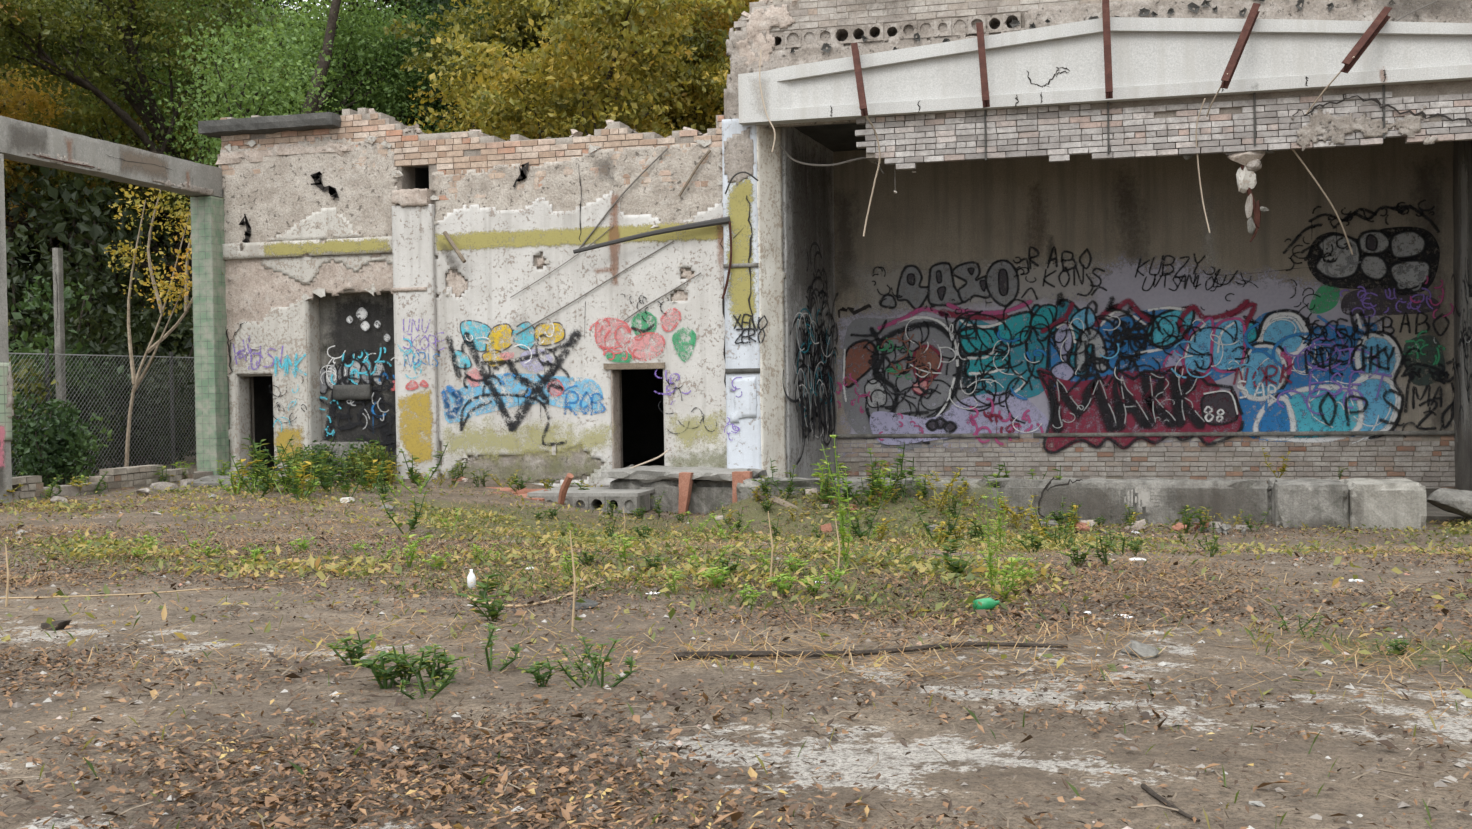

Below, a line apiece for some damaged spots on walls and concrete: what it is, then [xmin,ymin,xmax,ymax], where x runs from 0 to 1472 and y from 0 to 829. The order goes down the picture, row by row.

spalling [736,4,796,68]
spalling [1291,106,1438,151]